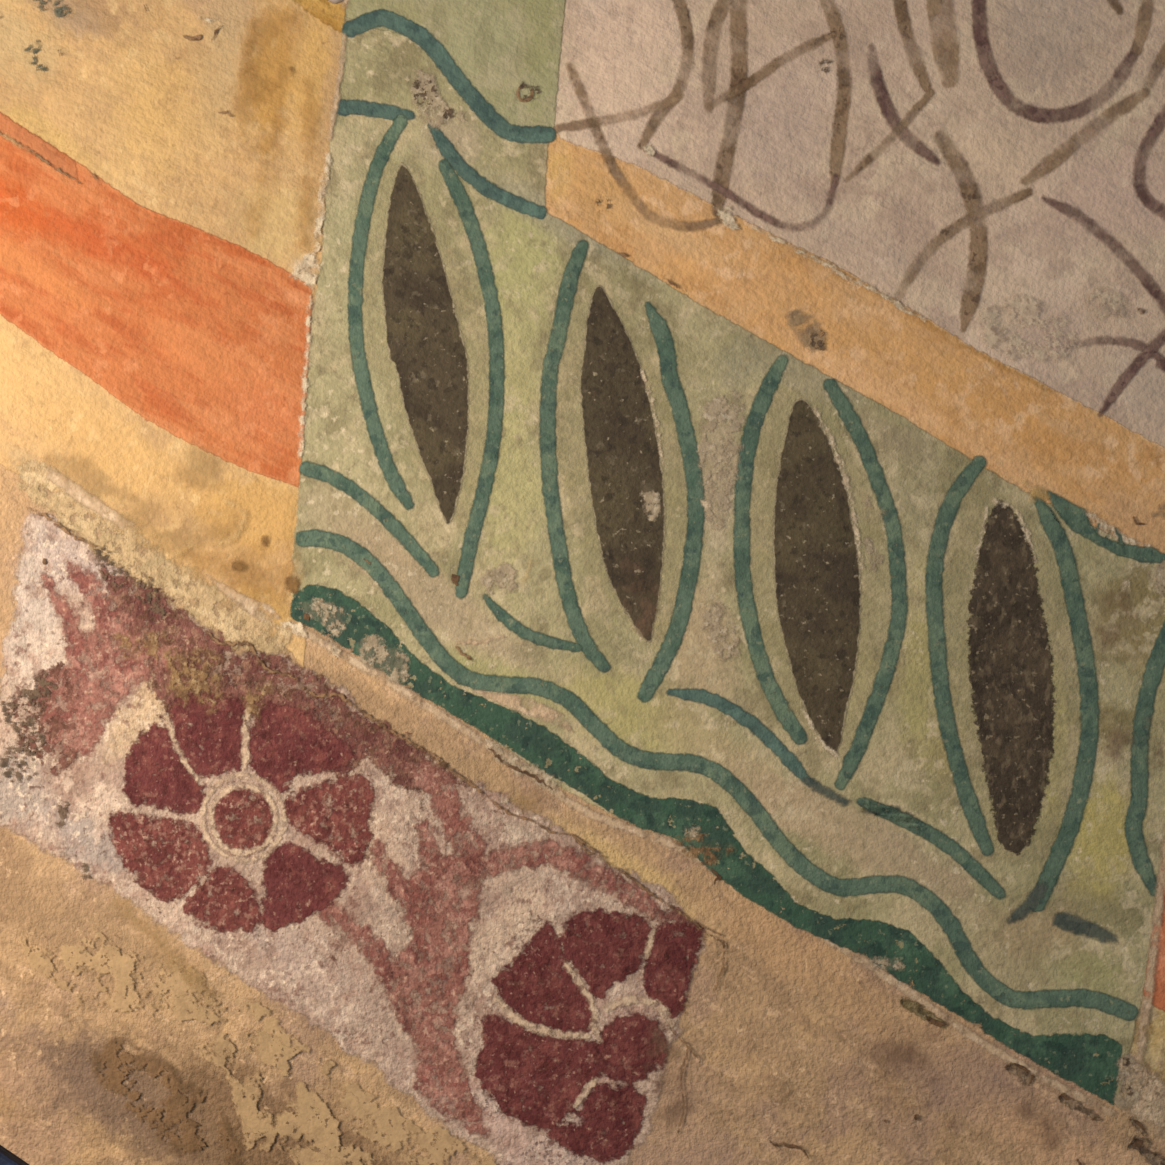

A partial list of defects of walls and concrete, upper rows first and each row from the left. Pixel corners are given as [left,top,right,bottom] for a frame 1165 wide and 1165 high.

spalling [900,998,947,1028]
crack [670,1028,698,1134]
spalling [1005,1062,1035,1085]
spalling [1058,1093,1101,1120]